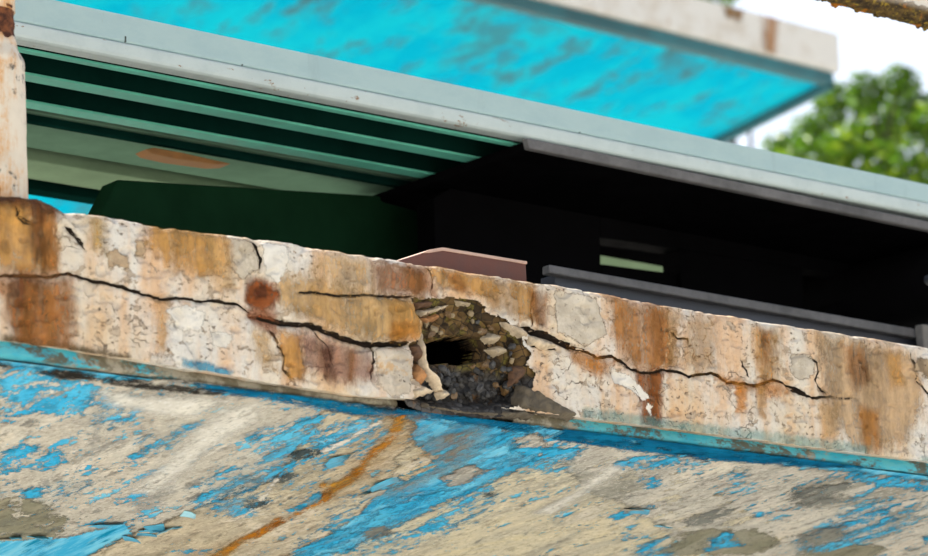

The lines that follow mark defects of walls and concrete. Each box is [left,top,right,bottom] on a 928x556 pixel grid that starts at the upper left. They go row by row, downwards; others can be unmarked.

rust [0,3,15,38]
rust [0,196,73,349]
crack [65,226,85,250]
crack [0,272,409,379]
crack [250,241,262,270]
rust [211,414,405,556]
crack [298,266,433,299]
rust [245,256,545,380]
peeling [0,296,928,556]
rust [611,298,676,427]
crack [521,292,852,400]
rust [816,335,921,453]